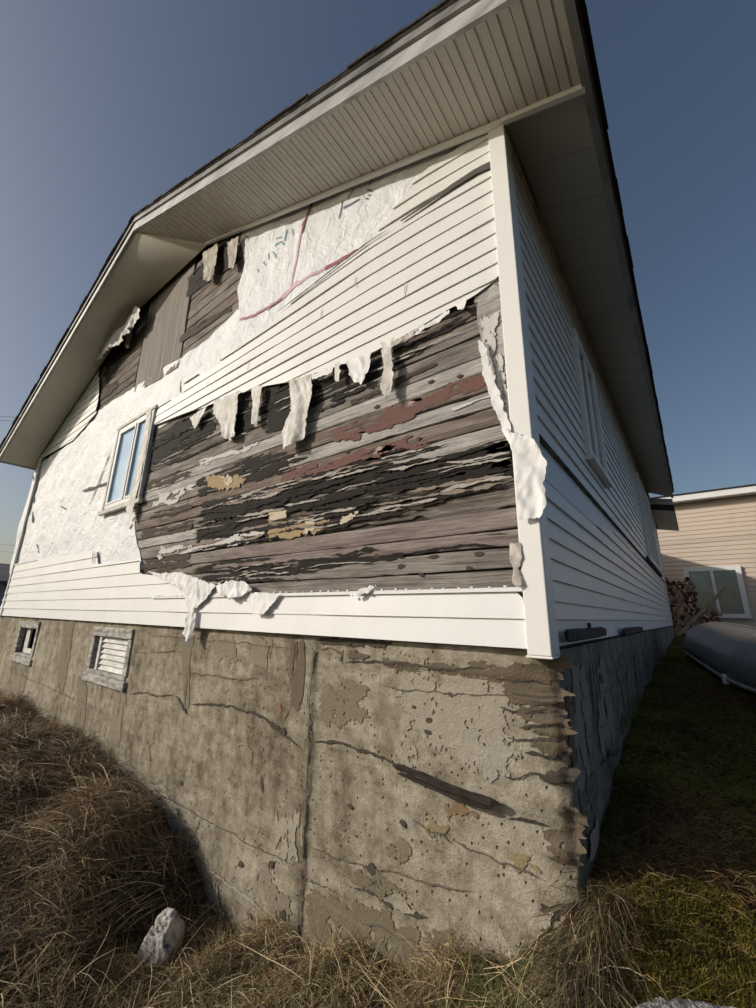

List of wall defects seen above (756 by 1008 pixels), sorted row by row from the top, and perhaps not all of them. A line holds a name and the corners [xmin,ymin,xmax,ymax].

peeling [480,311,509,417]
crack [133,635,515,944]
spalling [539,767,582,785]
spalling [558,806,590,827]